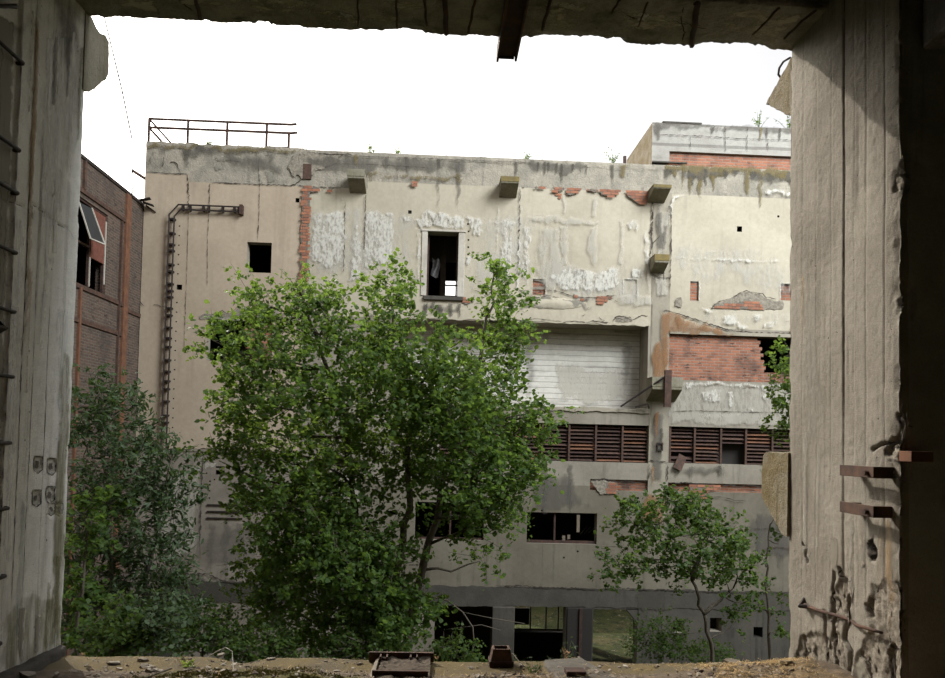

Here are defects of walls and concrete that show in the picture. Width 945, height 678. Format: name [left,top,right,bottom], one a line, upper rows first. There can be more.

damp [0,16,14,419]
peeling [288,152,483,282]
peeling [497,186,682,310]
damp [664,164,791,207]
rust [652,312,723,377]
spalling [699,281,789,329]
spalling [591,480,617,495]
spalling [779,577,901,678]